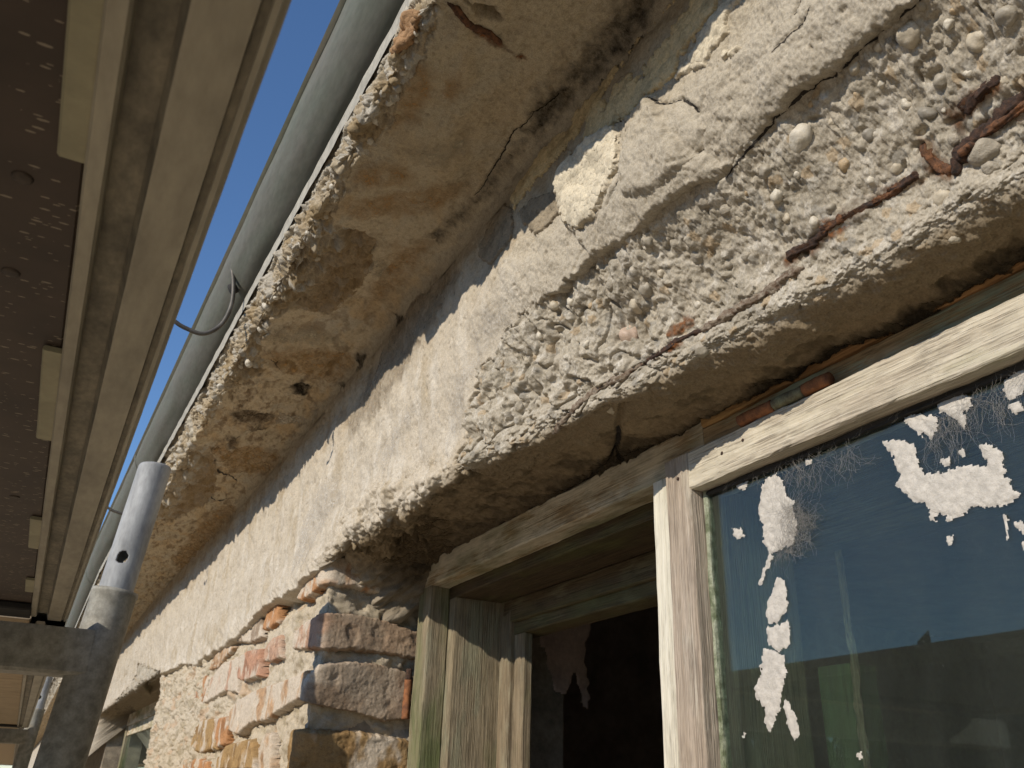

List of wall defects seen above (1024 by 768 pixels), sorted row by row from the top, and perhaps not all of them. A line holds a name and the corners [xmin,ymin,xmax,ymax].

corrosion [447,2,525,59]
crack [476,93,559,194]
crack [727,0,922,177]
spalling [156,0,447,520]
spalling [457,0,1024,480]
corrosion [552,75,1024,435]
crack [584,425,624,481]